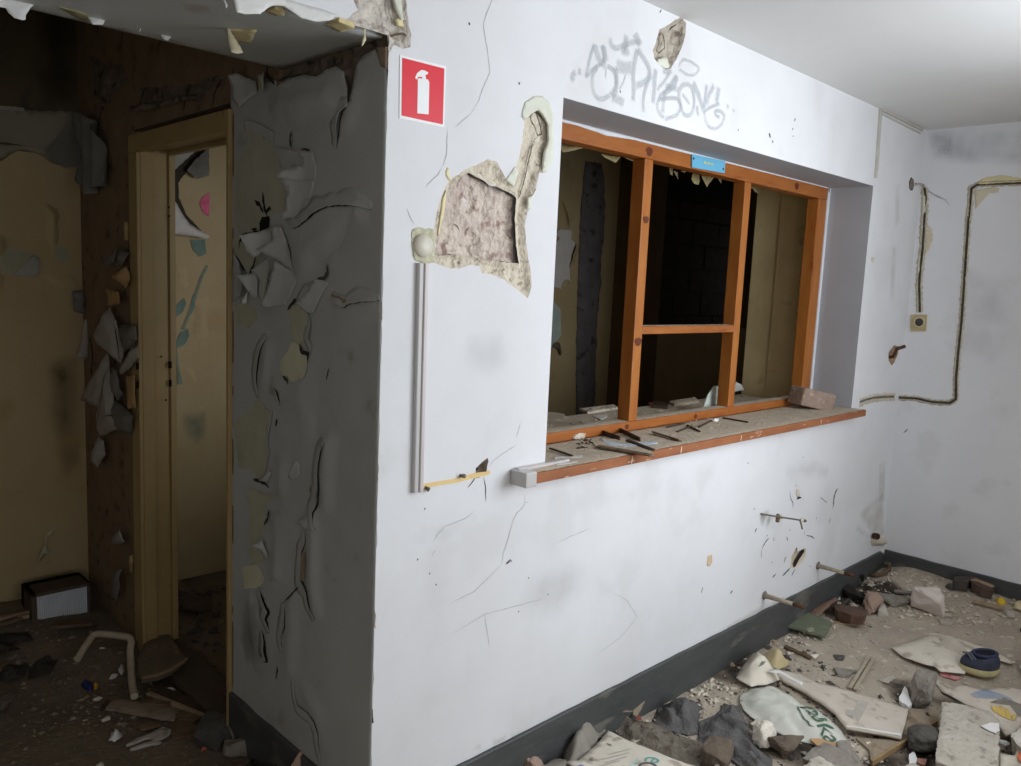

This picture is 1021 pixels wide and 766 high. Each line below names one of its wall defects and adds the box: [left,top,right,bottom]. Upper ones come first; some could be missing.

peeling [0,0,33,20]
peeling [59,6,105,25]
flaking render [219,0,411,107]
crack [426,0,492,187]
flaking render [653,18,686,70]
peeling [0,106,108,194]
peeling [232,120,317,307]
flaking render [411,96,581,298]
peeling [72,247,139,468]
peeling [279,342,309,383]
crack [452,497,528,603]